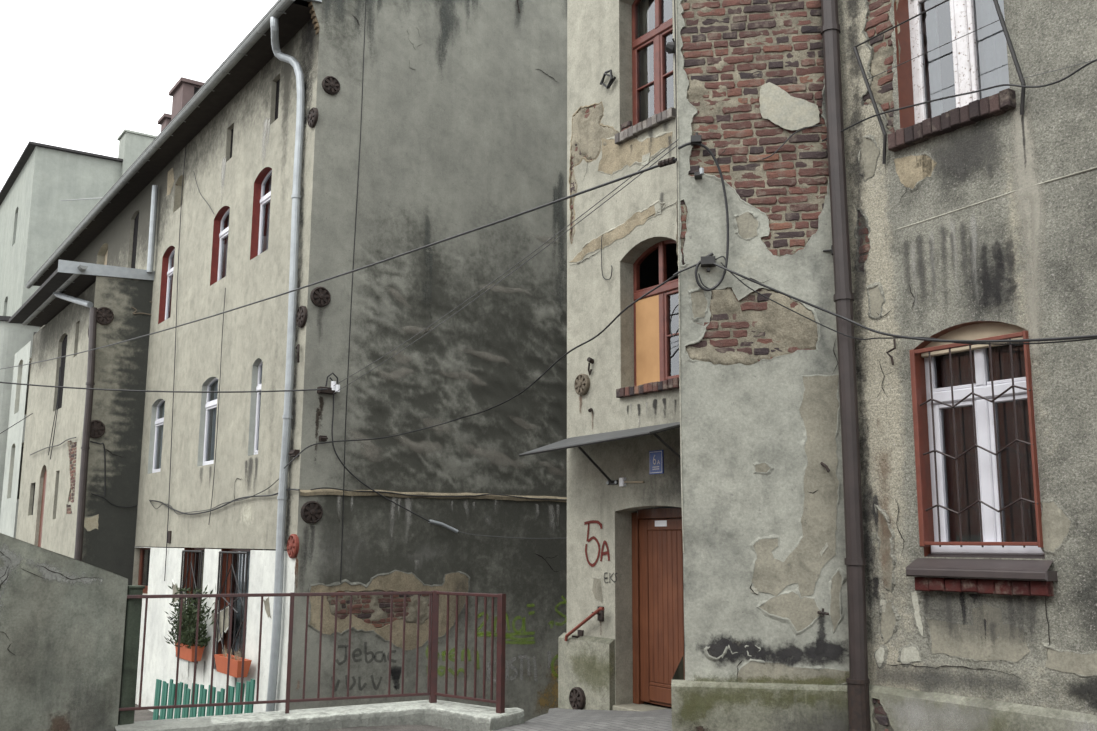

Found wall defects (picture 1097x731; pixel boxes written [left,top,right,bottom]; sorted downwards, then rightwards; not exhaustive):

leakage [436,0,457,56]
flaking render [860,0,901,133]
flaking render [679,0,829,258]
flaking render [569,101,690,268]
leakage [553,175,565,300]
leakage [904,225,974,286]
flaking render [684,286,820,366]
leakage [391,497,411,532]
flaking render [749,374,847,635]
crack [0,551,95,588]
flaking render [308,570,471,651]
leakage [1067,678,1097,703]